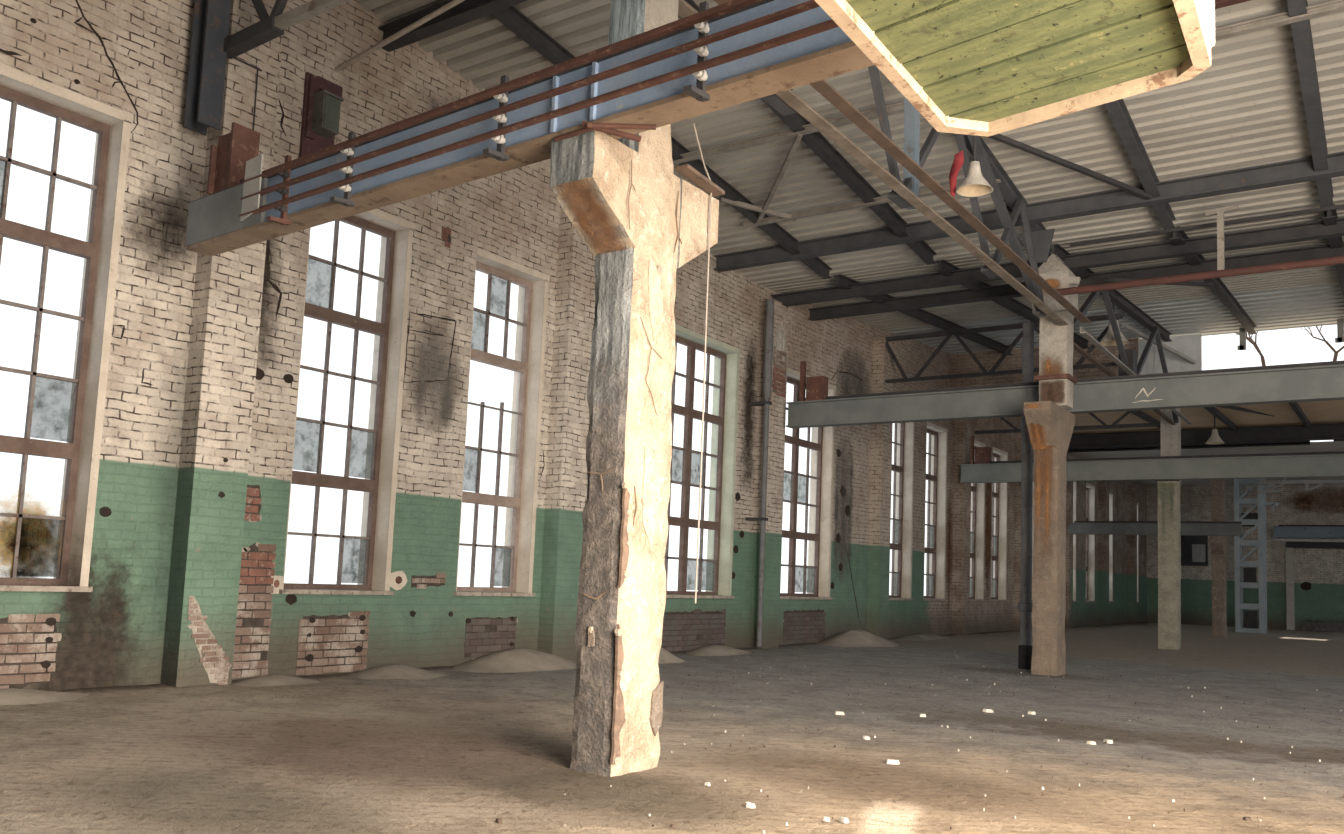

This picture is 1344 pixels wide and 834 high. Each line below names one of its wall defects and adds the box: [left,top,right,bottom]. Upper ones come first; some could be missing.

crack [74,0,139,133]
water stain [417,336,455,419]
flaking render [244,485,262,522]
flaking render [0,614,62,689]
water stain [68,567,89,616]
flaking render [187,542,370,685]
flaking render [448,612,518,660]
spalling [587,626,595,647]
spalling [610,624,628,765]
spalling [650,681,664,736]